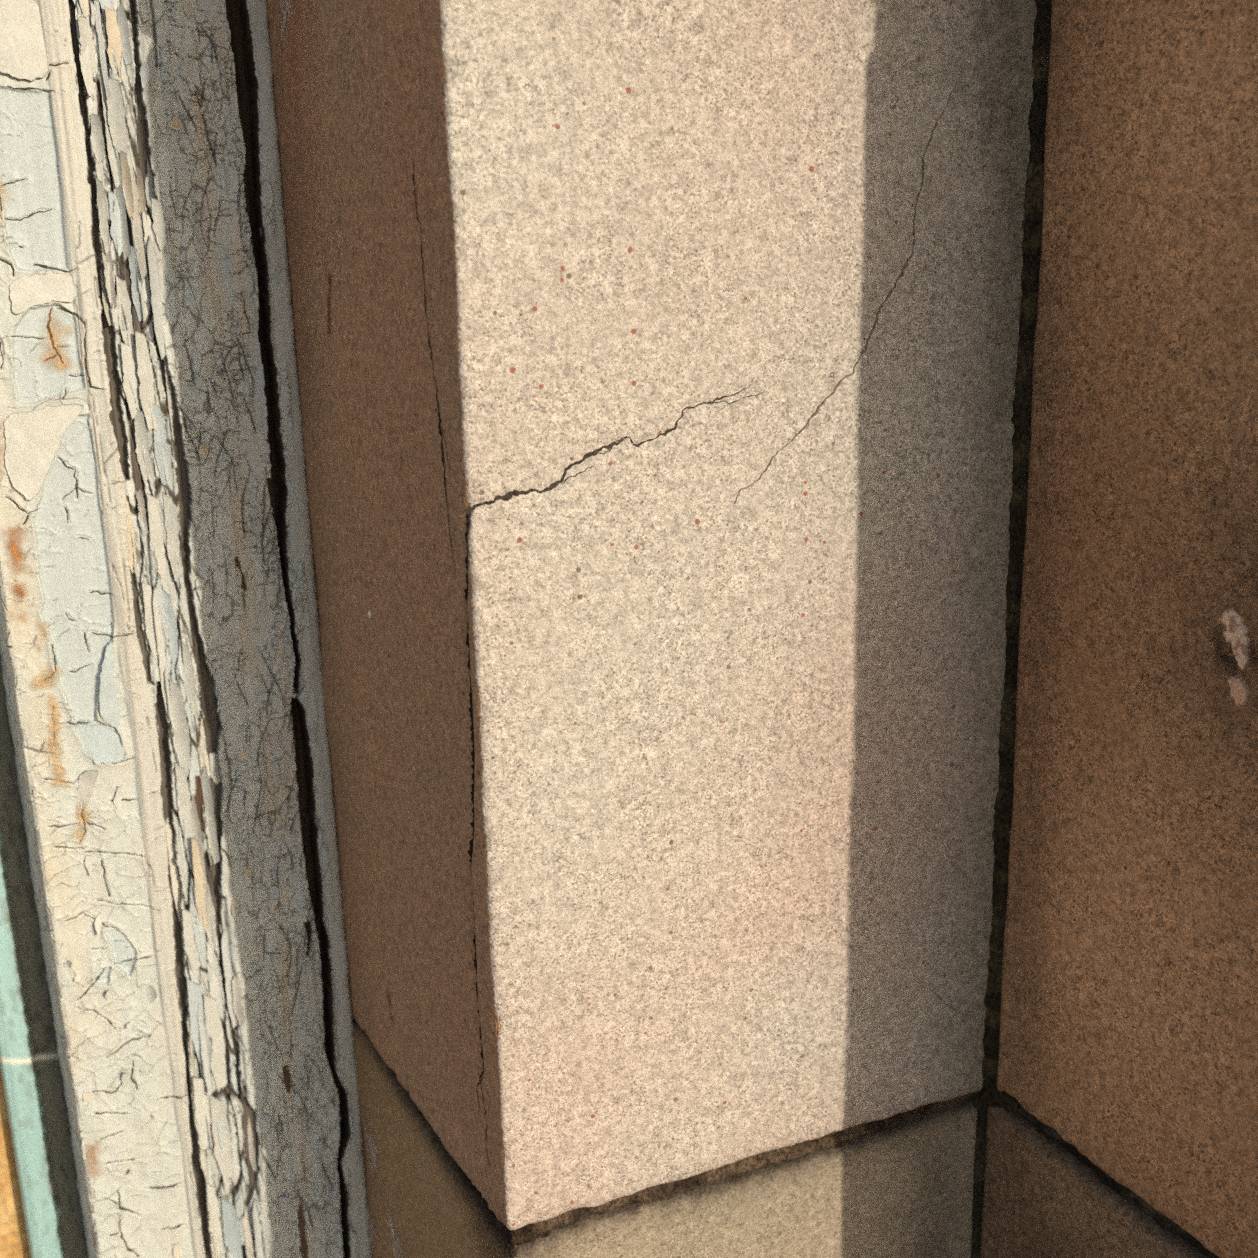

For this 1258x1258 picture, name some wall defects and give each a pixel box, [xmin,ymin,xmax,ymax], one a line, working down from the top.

peeling [0,0,49,81]
peeling [10,273,78,314]
crack [735,83,957,503]
peeling [4,403,83,500]
peeling [73,0,264,1258]
crack [412,167,764,1167]
spalling [1220,607,1250,707]